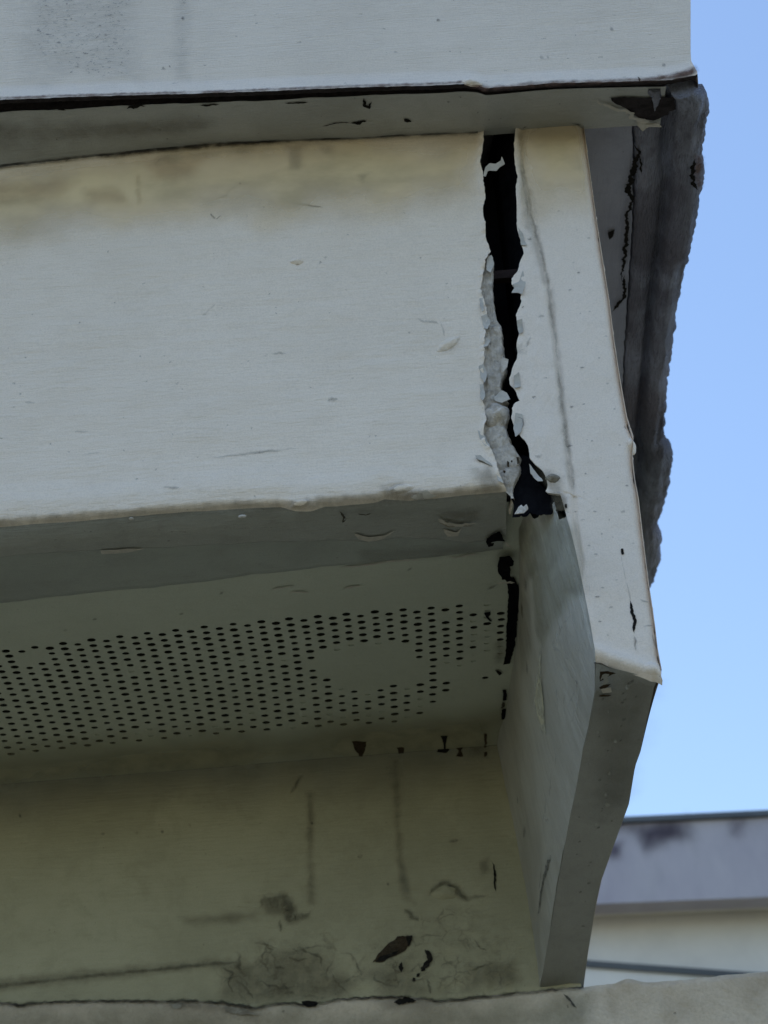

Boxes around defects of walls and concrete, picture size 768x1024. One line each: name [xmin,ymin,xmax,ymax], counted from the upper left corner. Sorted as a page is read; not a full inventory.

water stain [0,150,458,221]
crack [608,145,643,313]
spalling [611,97,676,131]
peeling [475,255,560,514]
crack [481,157,567,518]
spalling [373,935,412,963]